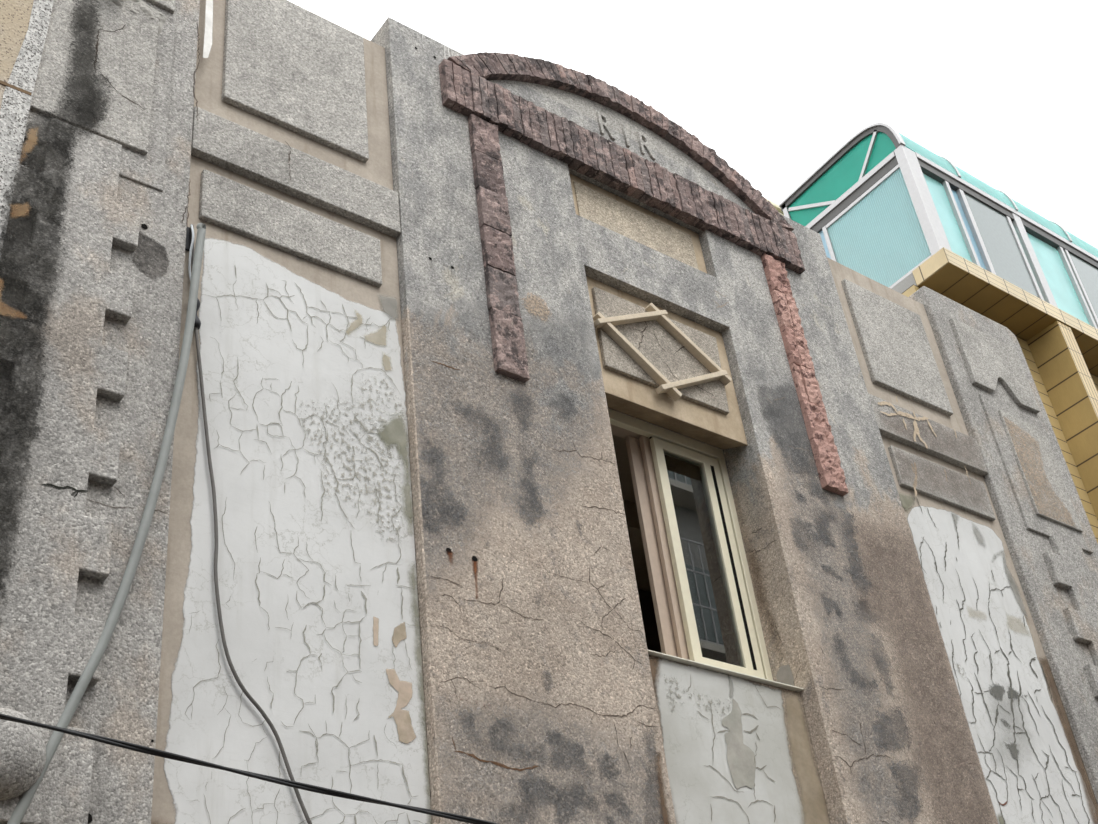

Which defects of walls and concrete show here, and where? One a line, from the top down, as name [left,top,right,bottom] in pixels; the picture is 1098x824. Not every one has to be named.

spalling [12,204,29,217]
spalling [0,279,26,318]
water stain [0,0,111,604]
water stain [346,296,397,370]
water stain [411,293,592,562]
water stain [878,396,937,449]
crack [41,483,166,514]
crack [185,267,543,824]
peeling [392,622,407,647]
crack [916,497,1090,824]
peeling [386,669,416,744]
crack [687,676,780,824]